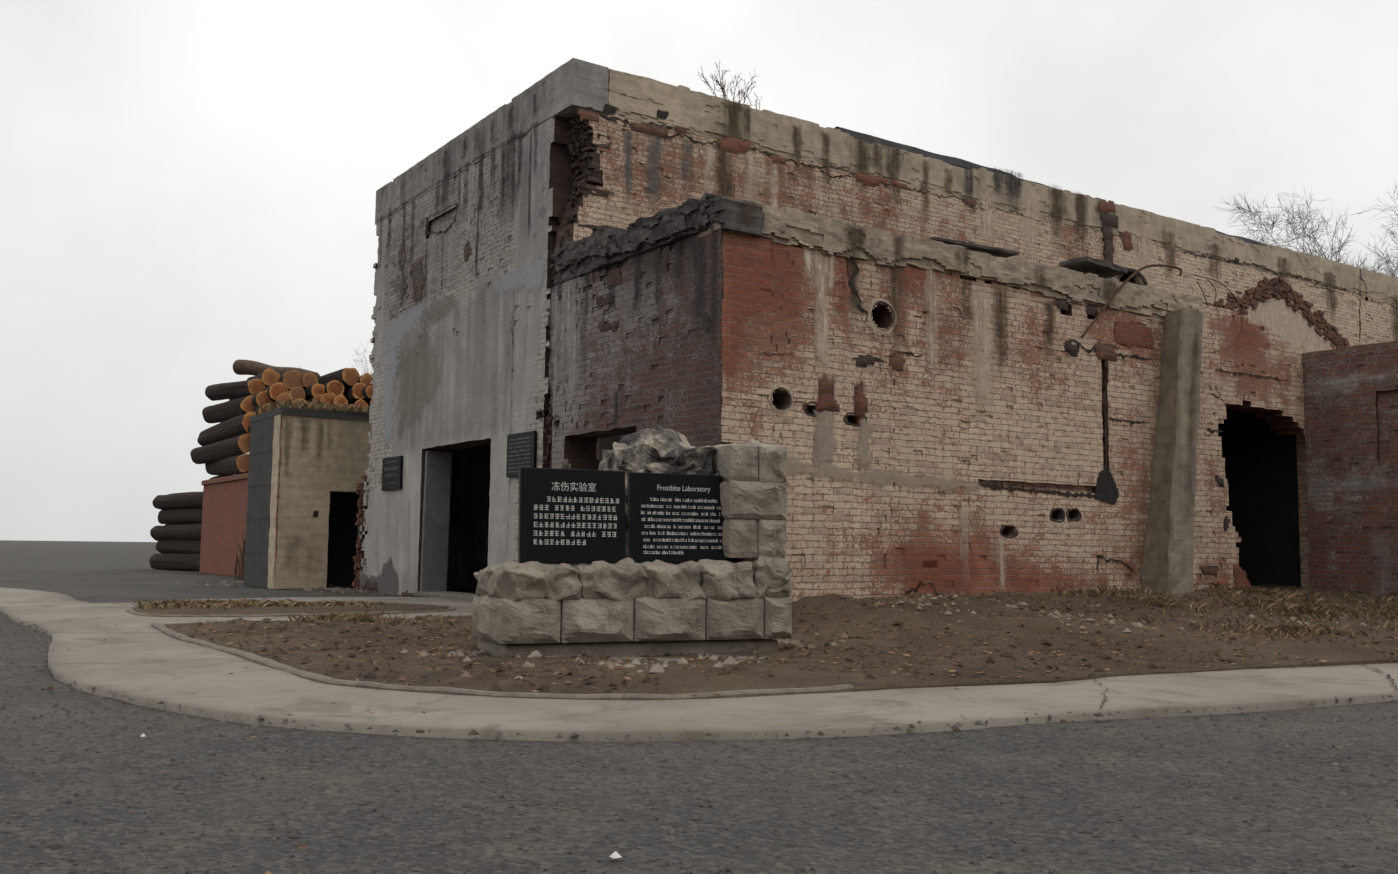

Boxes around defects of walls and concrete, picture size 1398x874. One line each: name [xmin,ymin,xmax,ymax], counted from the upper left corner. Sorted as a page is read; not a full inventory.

damp [432,83,551,266]
damp [626,132,660,195]
crack [377,88,1048,226]
damp [683,101,778,223]
damp [793,127,801,157]
damp [858,138,899,195]
damp [945,165,1109,244]
spalling [359,557,417,597]